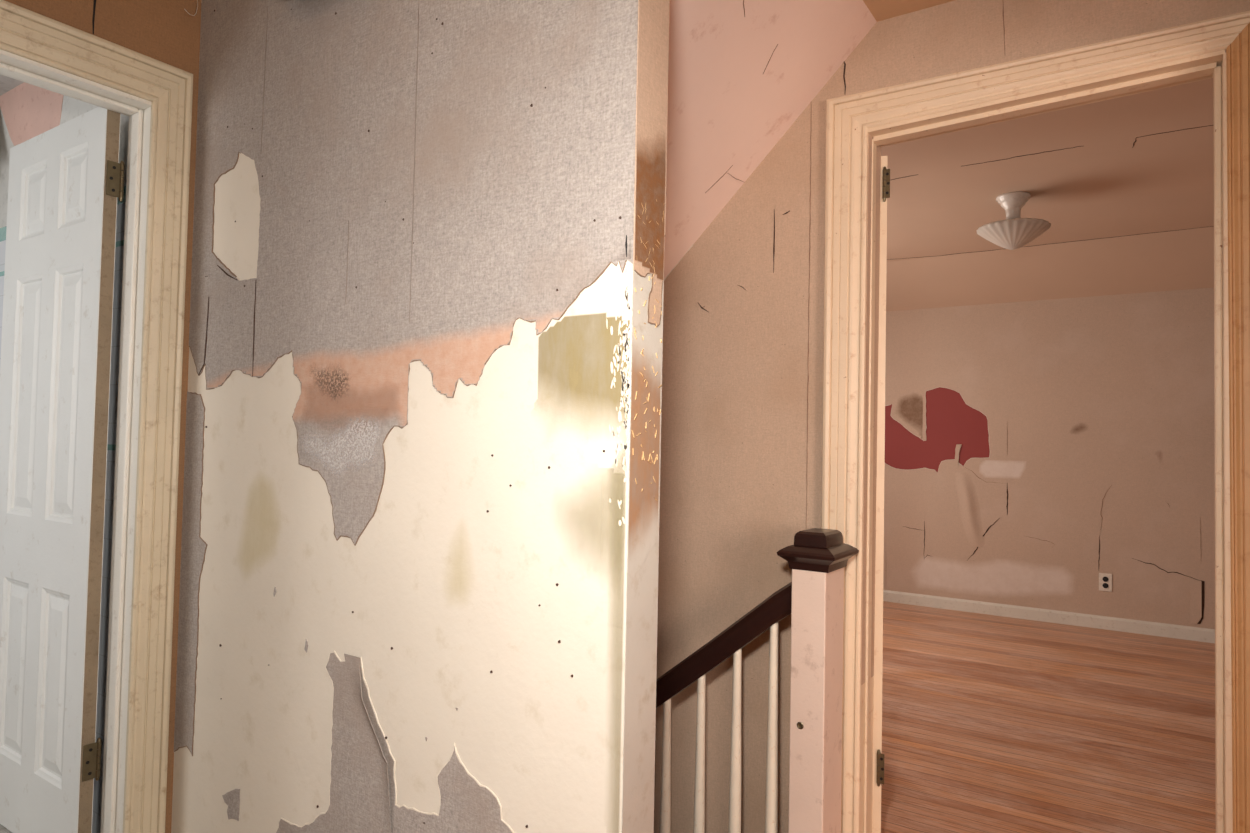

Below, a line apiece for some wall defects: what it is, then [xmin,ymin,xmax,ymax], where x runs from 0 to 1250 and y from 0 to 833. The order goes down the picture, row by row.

damp [207,261,632,526]
crack [1132,558,1205,624]
peeling [222,789,240,821]